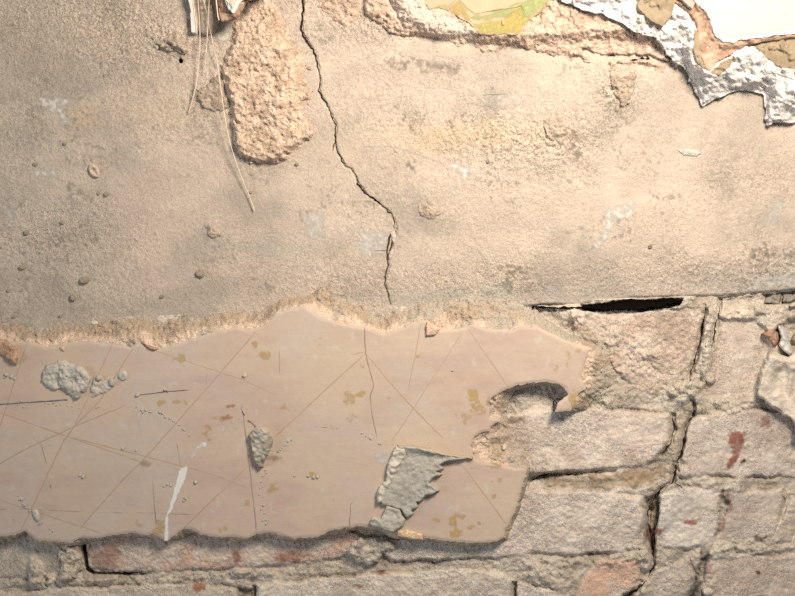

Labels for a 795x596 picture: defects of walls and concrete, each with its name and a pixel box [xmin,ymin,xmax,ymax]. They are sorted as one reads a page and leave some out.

peeling [449,0,548,33]
crack [300,0,396,304]
spalling [0,287,617,547]
peeling [764,293,795,304]